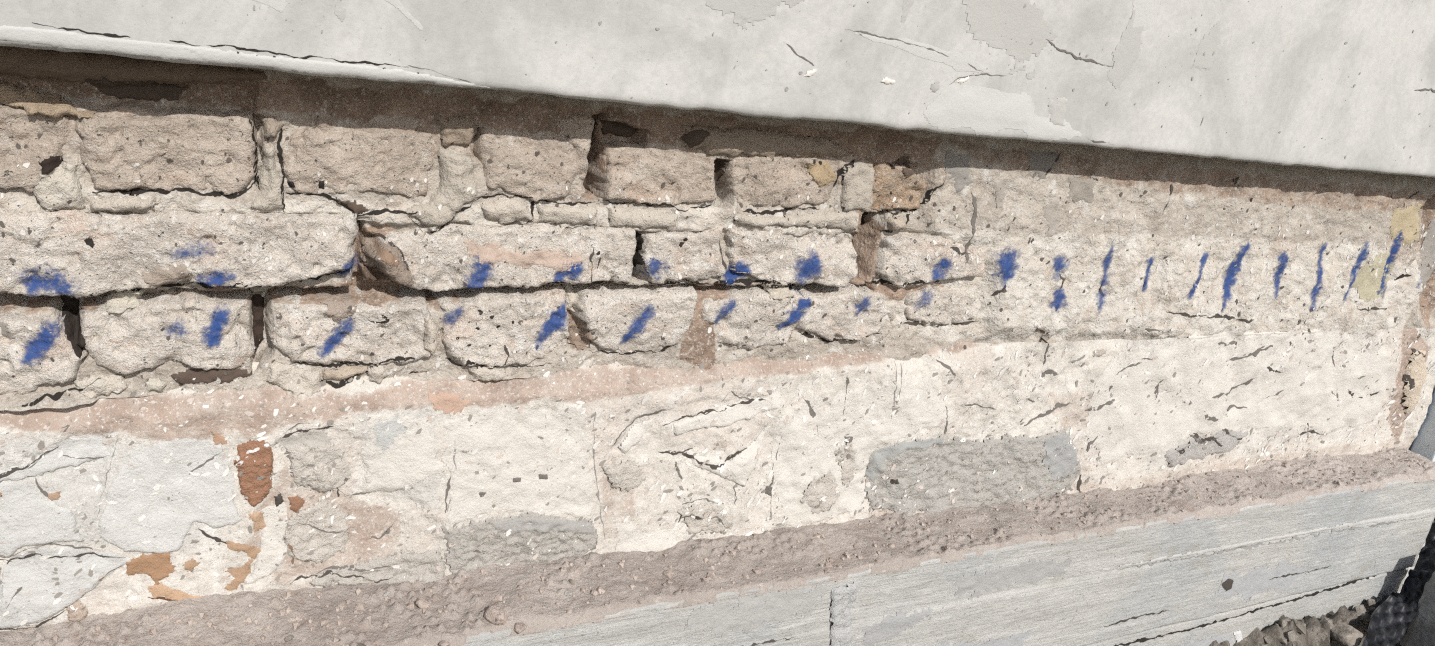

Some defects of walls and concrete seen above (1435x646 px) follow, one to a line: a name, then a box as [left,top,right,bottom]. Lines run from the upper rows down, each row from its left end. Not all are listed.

crack [169,40,469,82]
spalling [315,285,357,324]
spalling [359,235,415,286]
crack [289,345,552,389]
crack [0,119,855,290]
spalling [567,314,594,350]
spalling [888,156,914,178]
crack [1024,280,1283,492]
crack [593,391,782,535]
peeling [227,327,1427,595]
peeling [0,436,243,629]
crack [1105,516,1431,646]